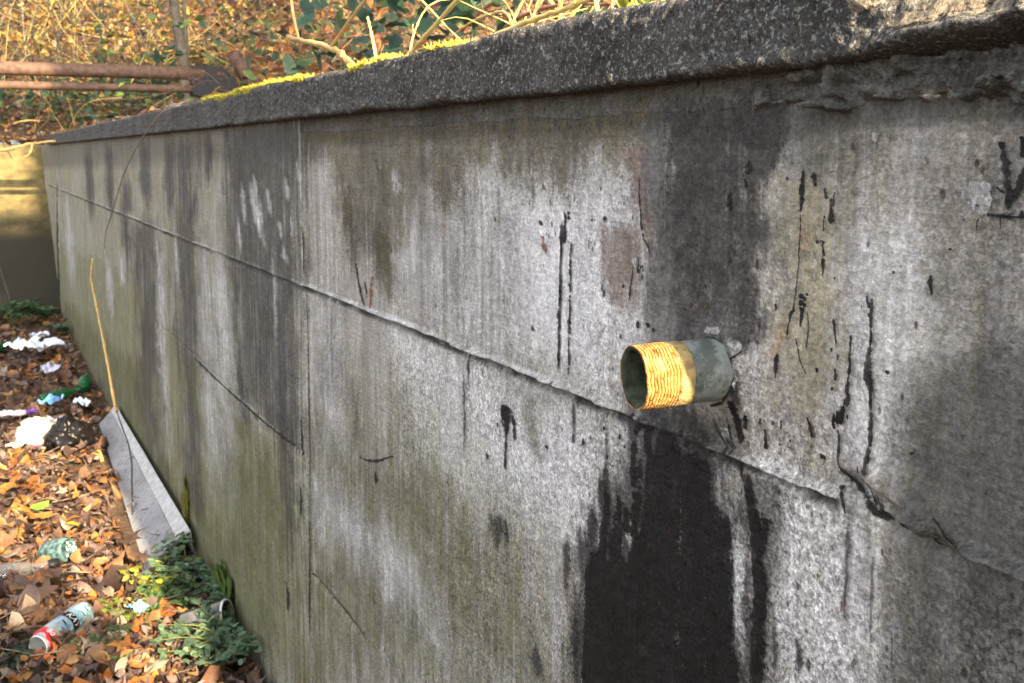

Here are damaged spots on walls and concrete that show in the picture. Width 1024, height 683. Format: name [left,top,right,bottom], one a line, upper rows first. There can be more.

damp [45,179,76,281]
damp [557,211,572,375]
damp [588,91,874,477]
damp [84,119,443,655]
damp [561,371,791,683]
crack [836,429,909,530]
crack [933,518,956,548]
damp [531,644,544,678]